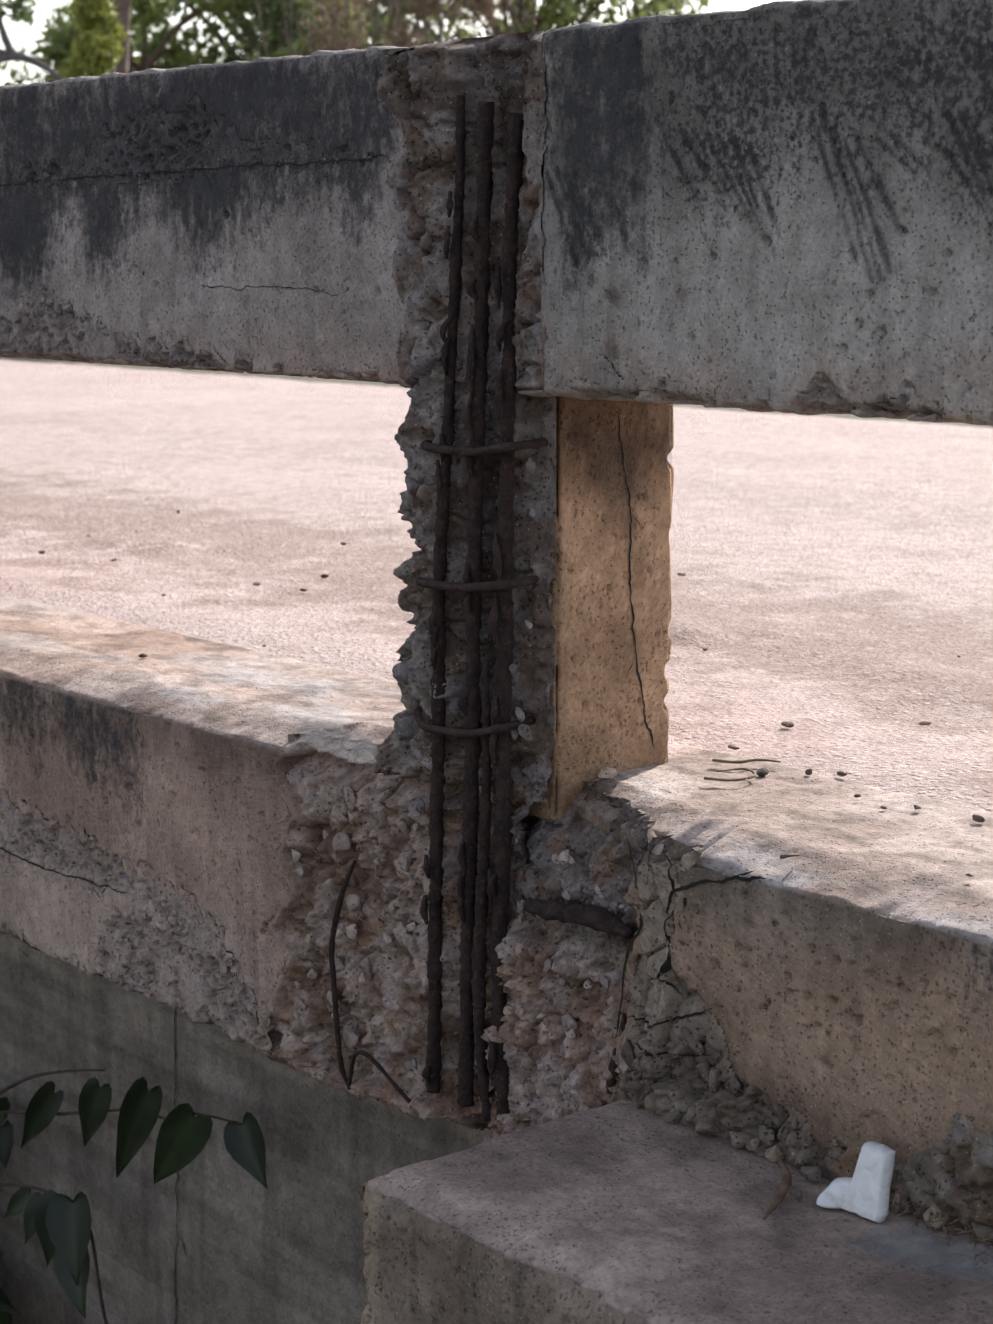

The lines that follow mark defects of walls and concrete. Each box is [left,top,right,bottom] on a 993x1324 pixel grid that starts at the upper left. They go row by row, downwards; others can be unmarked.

spalling [663,9,774,26]
water stain [0,49,395,293]
water stain [541,0,993,287]
spalling [0,288,383,383]
crack [201,285,348,297]
spalling [795,373,945,415]
spalling [63,29,859,1181]
crack [618,414,654,747]
water stain [0,680,142,789]
crack [0,843,125,904]
crack [615,833,766,1057]
spalling [889,1113,993,1235]